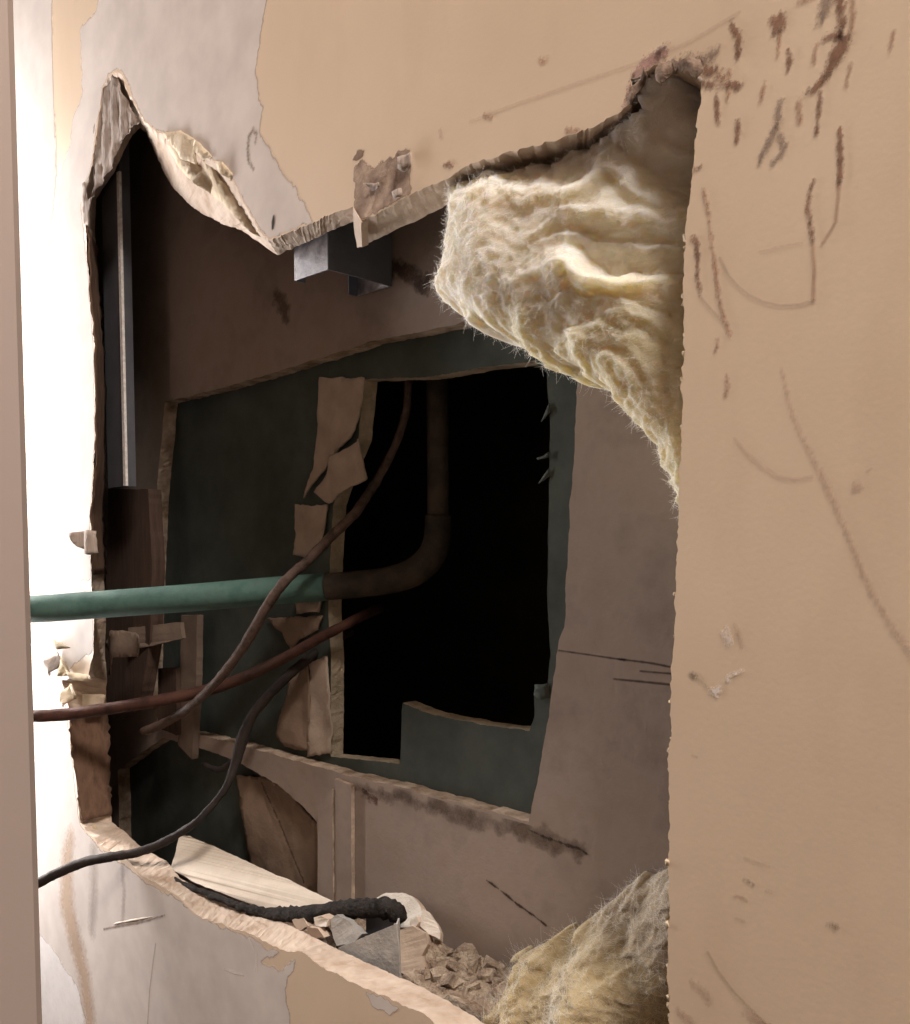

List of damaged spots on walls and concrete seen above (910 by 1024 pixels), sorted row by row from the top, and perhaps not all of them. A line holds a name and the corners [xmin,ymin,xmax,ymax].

peeling [13,0,312,594]
peeling [33,619,295,1024]
flaking render [292,913,368,946]
flaking render [377,893,443,974]